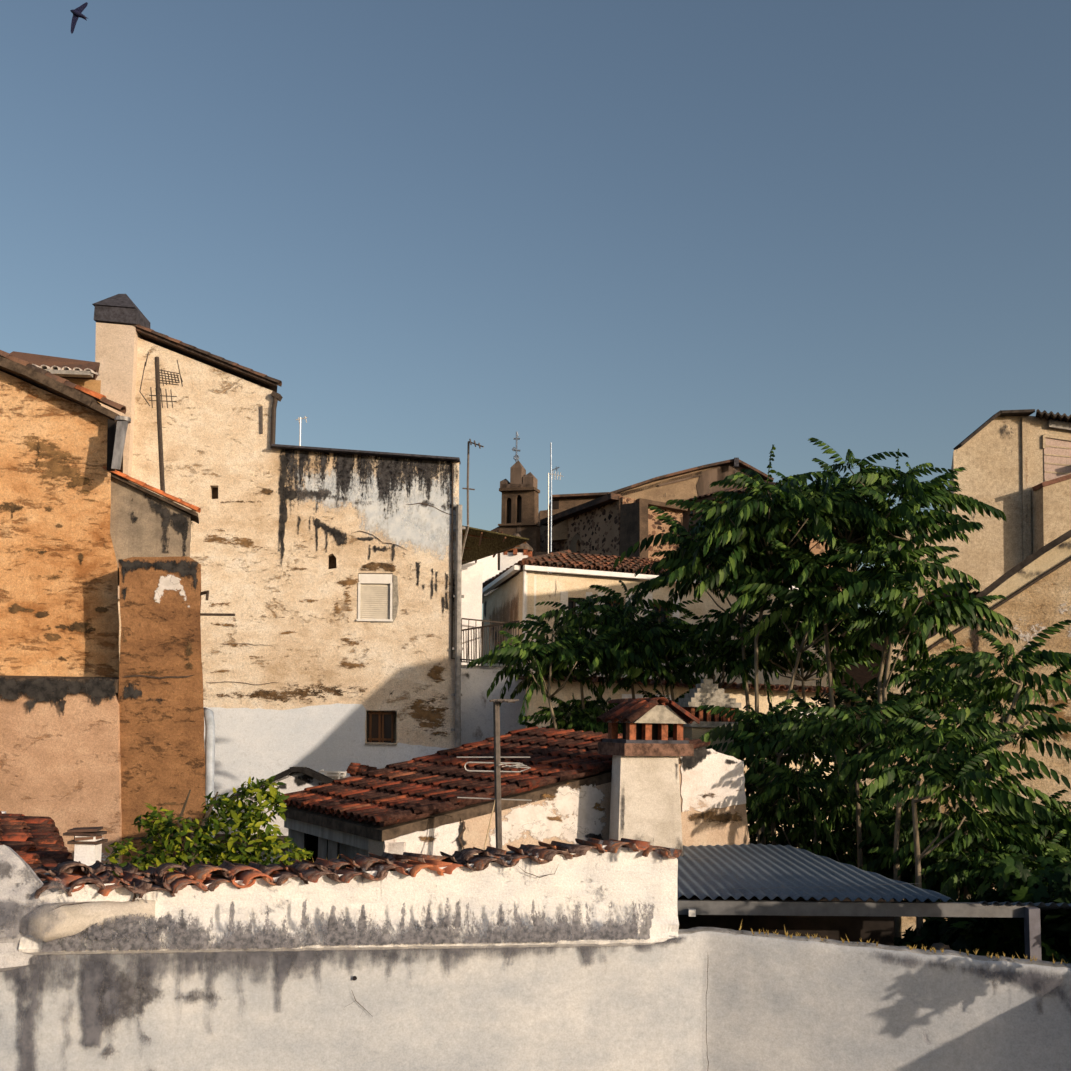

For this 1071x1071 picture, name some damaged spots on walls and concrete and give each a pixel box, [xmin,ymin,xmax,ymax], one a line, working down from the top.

water stain [278,449,459,565]
water stain [119,494,198,600]
peeling [154,574,190,607]
peeling [1014,619,1046,648]
peeling [489,783,607,848]
water stain [635,936,686,950]
water stain [5,946,599,1071]